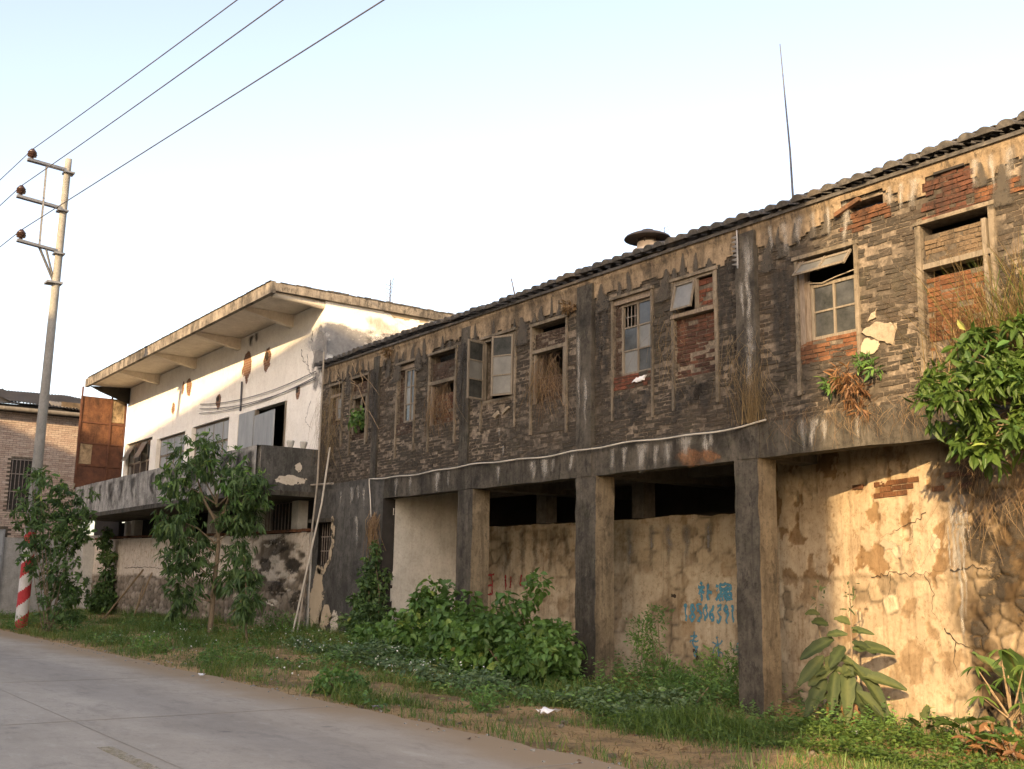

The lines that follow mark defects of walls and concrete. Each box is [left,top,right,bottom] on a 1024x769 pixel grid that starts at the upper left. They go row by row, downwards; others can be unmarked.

spalling [833,197,892,233]
spalling [921,163,1024,220]
damp [974,155,1024,208]
damp [656,212,830,375]
flaking render [242,347,271,384]
damp [307,323,427,438]
flaking render [275,463,307,485]
flaking render [852,476,919,498]
mould [259,535,304,611]
flaking render [307,516,339,632]
crack [871,564,993,679]